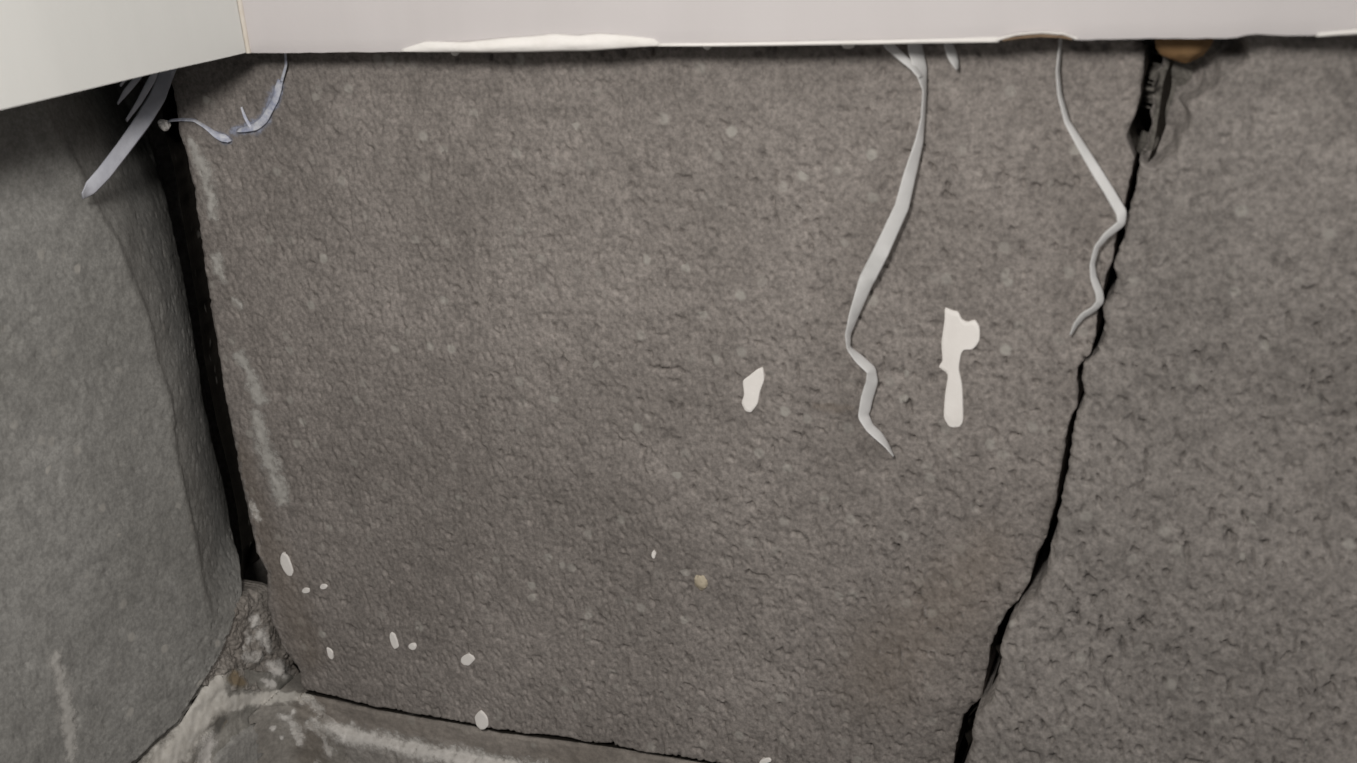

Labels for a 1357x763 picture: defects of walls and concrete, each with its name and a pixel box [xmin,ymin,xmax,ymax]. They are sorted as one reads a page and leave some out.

spalling [1130,38,1224,154]
crack [1110,45,1175,283]
peeling [939,307,980,427]
crack [1079,315,1104,400]
crack [1043,466,1069,543]
efflorescence [51,652,78,761]
damp [197,730,218,763]
efflorescence [269,696,548,763]
crack [305,690,717,763]
crack [958,603,1015,763]